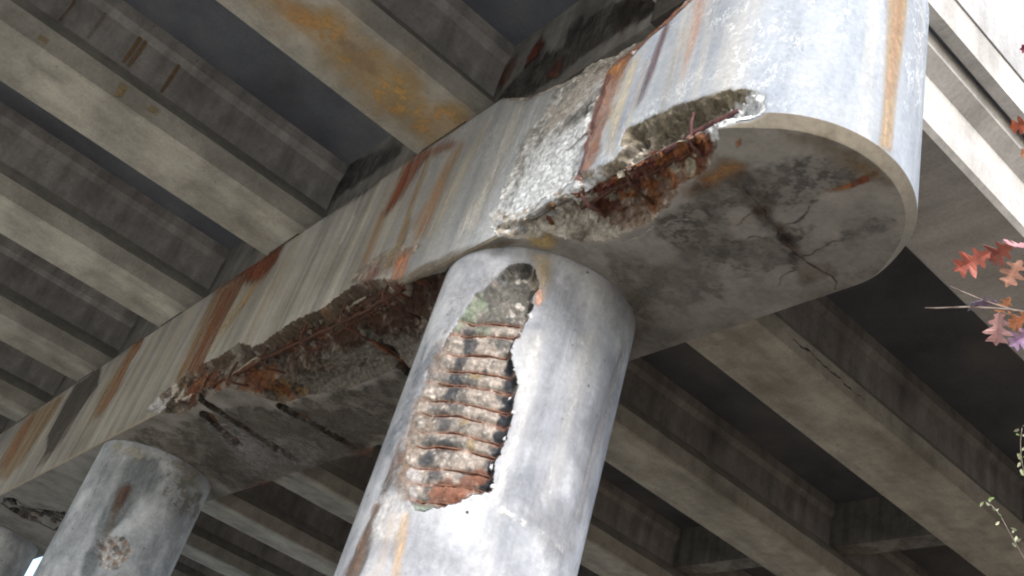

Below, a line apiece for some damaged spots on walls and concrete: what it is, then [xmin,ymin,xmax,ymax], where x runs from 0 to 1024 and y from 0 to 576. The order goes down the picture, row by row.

corrosion [89,339,143,422]
corrosion [178,247,282,377]
spalling [147,243,449,414]
spalling [402,263,539,511]
corrosion [580,23,668,178]
spalling [494,89,766,242]
leakage [607,137,879,319]
crack [732,186,839,290]
corrosion [881,0,907,149]
spalling [95,535,132,571]
corrosion [111,485,131,526]